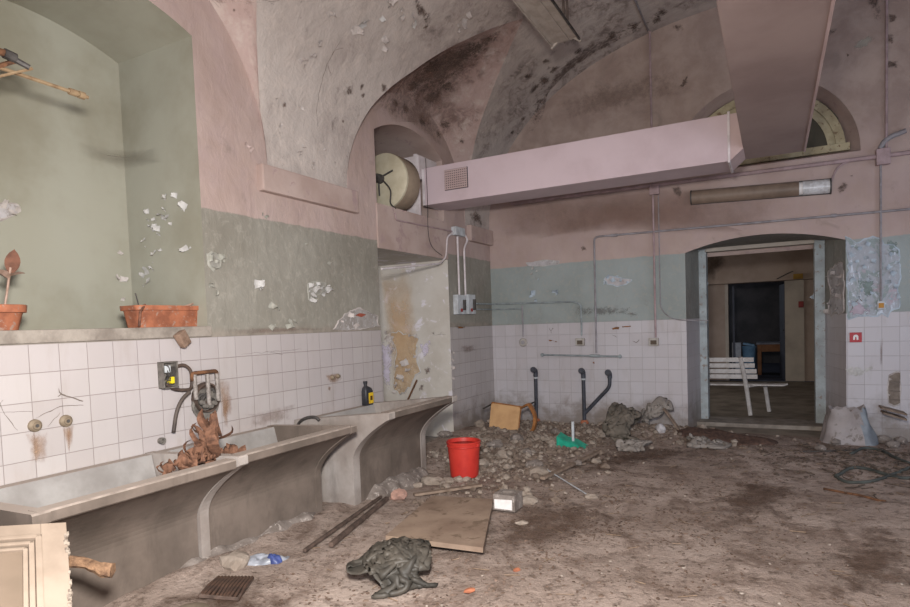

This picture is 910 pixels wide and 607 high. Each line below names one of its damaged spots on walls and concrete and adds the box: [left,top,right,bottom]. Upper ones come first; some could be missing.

damp [392,37,492,136]
peeling [139,193,188,287]
peeling [307,281,333,302]
peeling [845,236,902,320]
peeling [333,307,421,395]